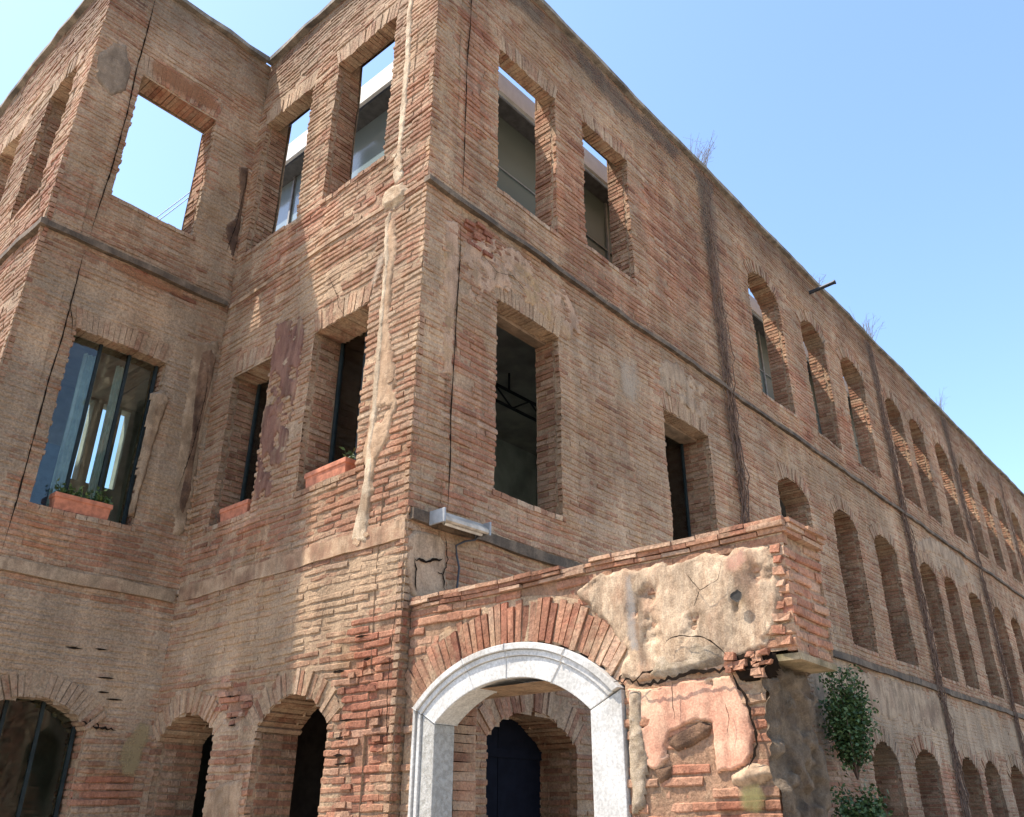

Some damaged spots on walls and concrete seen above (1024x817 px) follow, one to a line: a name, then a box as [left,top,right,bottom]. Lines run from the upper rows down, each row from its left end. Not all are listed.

crack [462,0,472,192]
spalling [463,218,493,259]
crack [2,2,155,549]
peeling [253,316,304,501]
crack [386,235,527,759]
spalling [331,657,392,691]
spalling [327,710,384,765]
peeling [669,722,713,751]
spalling [325,784,353,817]
peeling [655,765,673,784]